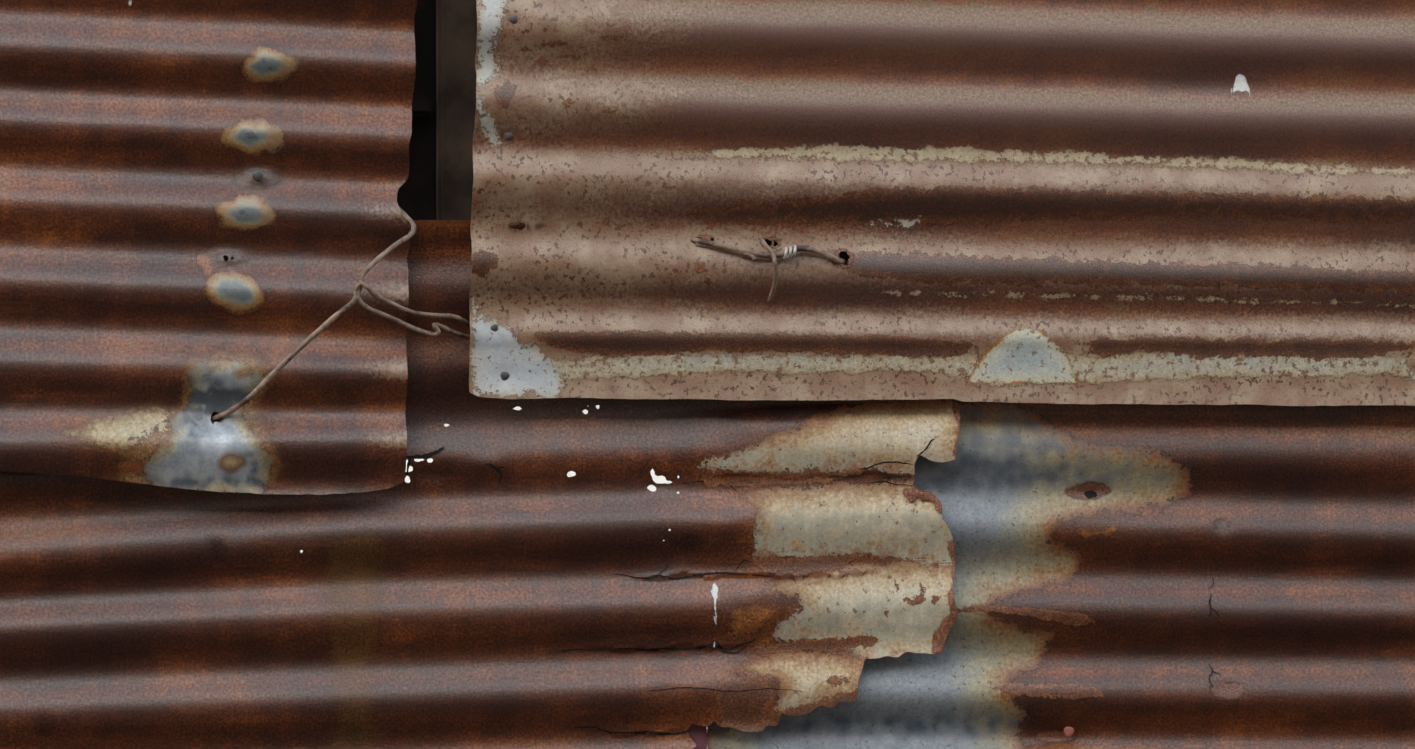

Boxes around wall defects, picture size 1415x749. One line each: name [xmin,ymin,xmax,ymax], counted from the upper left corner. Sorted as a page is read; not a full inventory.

rust [648,184,1415,230]
rust [472,249,499,279]
rust [824,250,1415,295]
peeling [470,297,565,399]
rust [534,329,973,358]
rust [1073,335,1415,364]
rust [102,345,294,490]
peeling [141,356,280,494]
peeling [697,324,1195,749]
rust [956,604,1098,627]
rust [715,677,777,725]
rust [994,681,1104,700]